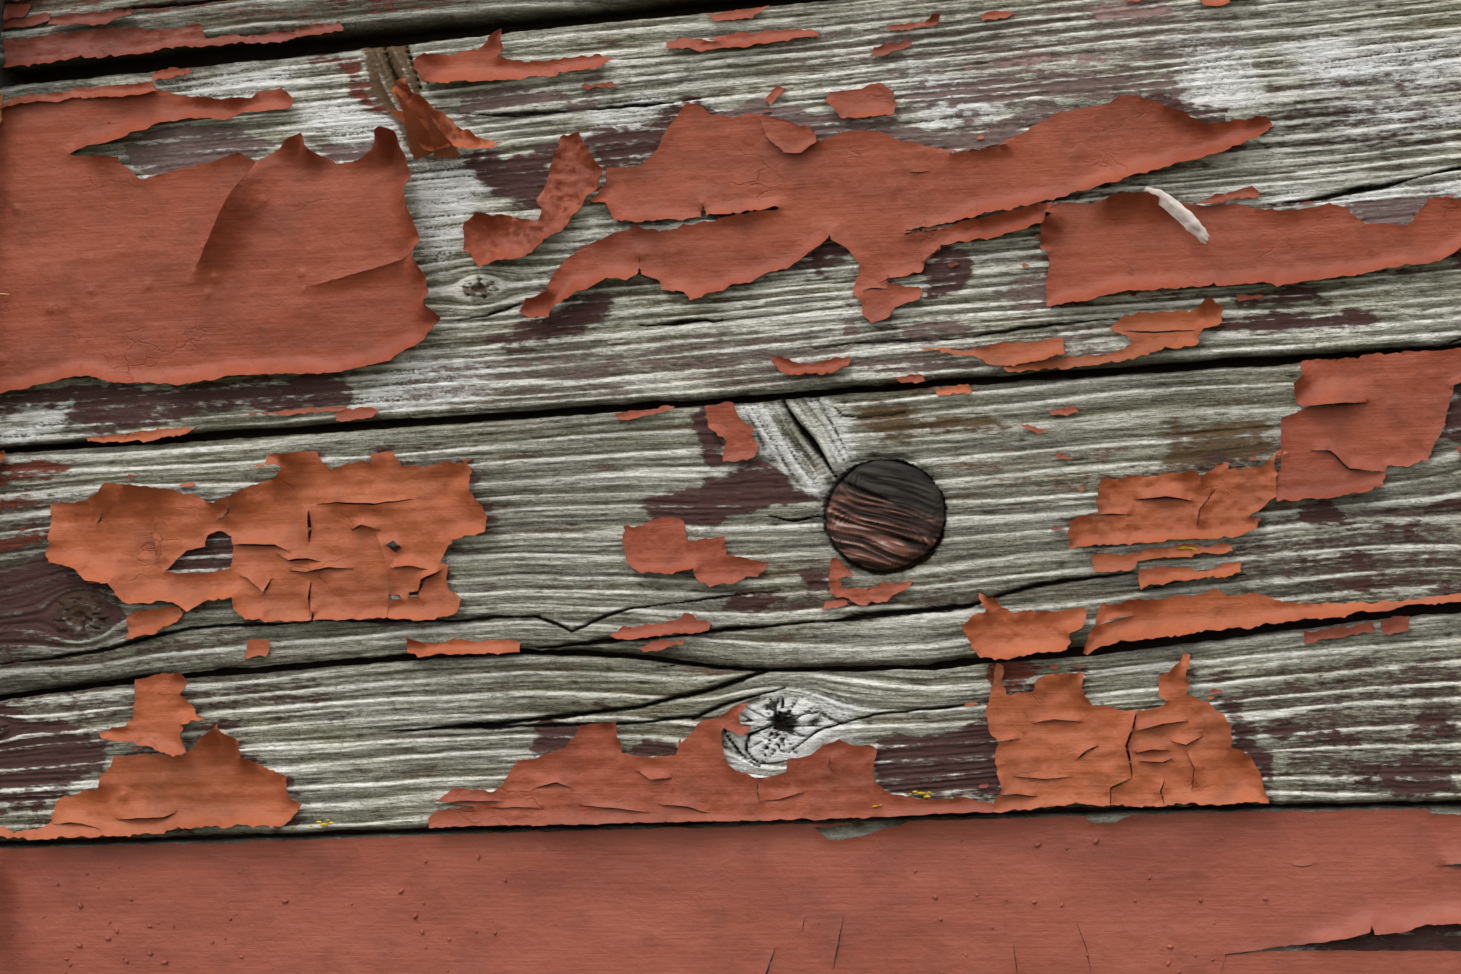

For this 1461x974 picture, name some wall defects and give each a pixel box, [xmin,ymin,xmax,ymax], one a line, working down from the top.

peeling [1,0,344,69]
peeling [666,5,820,52]
peeling [870,13,941,57]
peeling [980,10,1014,21]
peeling [0,28,618,394]
peeling [463,83,1461,373]
crack [1272,166,1461,206]
crack [4,572,1179,767]
peeling [0,348,1461,974]